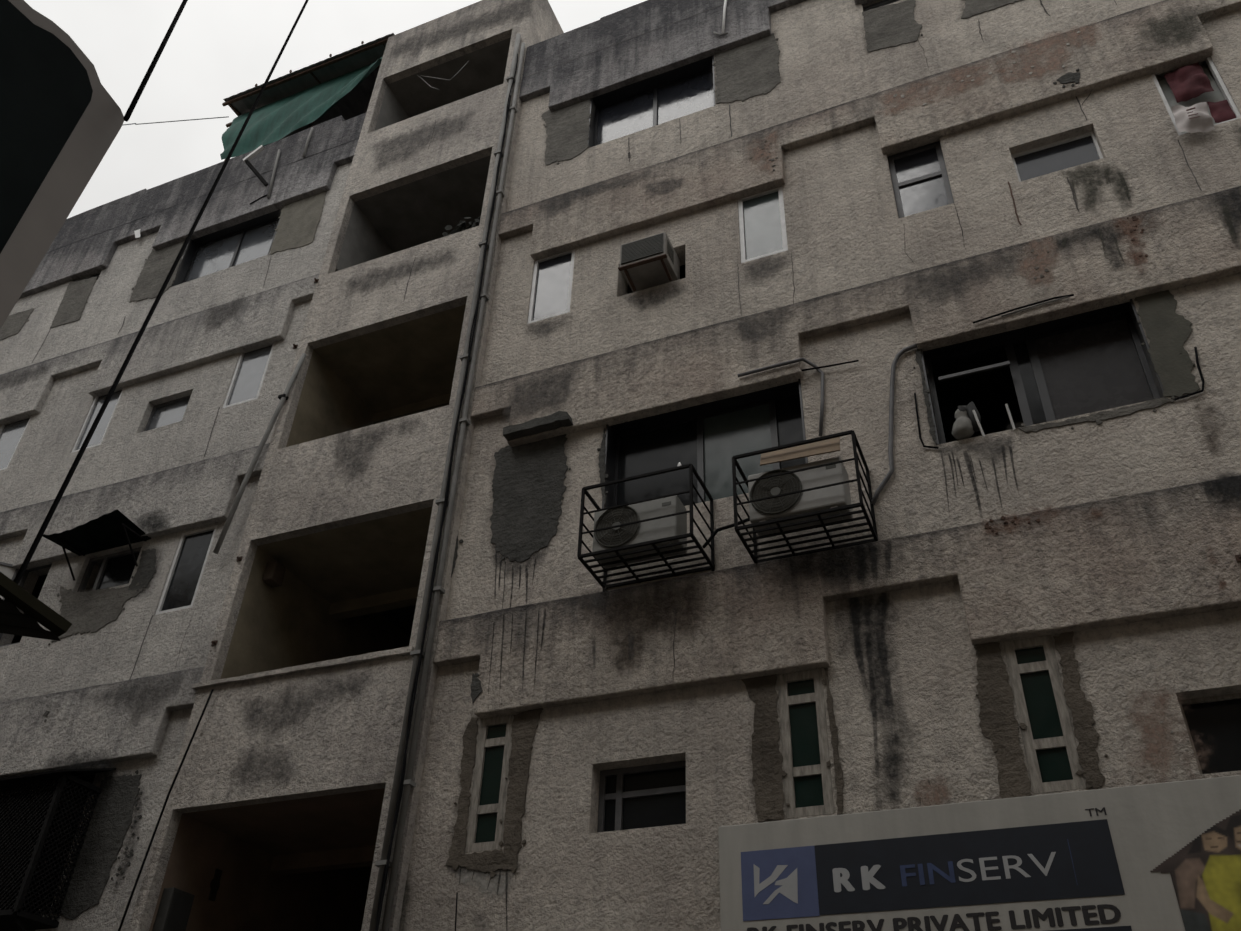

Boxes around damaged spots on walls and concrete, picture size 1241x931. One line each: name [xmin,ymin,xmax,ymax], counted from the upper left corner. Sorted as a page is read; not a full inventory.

damp [940,439,1018,510]
damp [488,552,546,689]
damp [798,545,902,800]